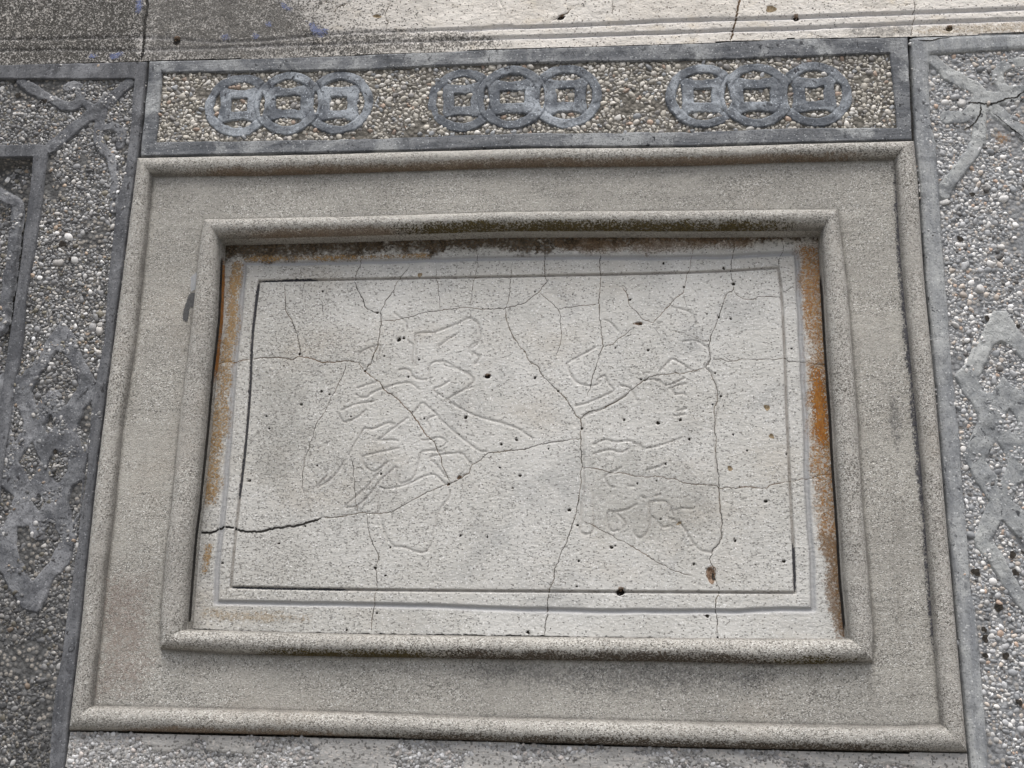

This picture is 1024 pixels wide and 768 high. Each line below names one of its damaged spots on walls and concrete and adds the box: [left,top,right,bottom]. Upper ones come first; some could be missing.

rust [205,253,430,505]
crack [189,243,845,637]
rust [797,245,844,637]